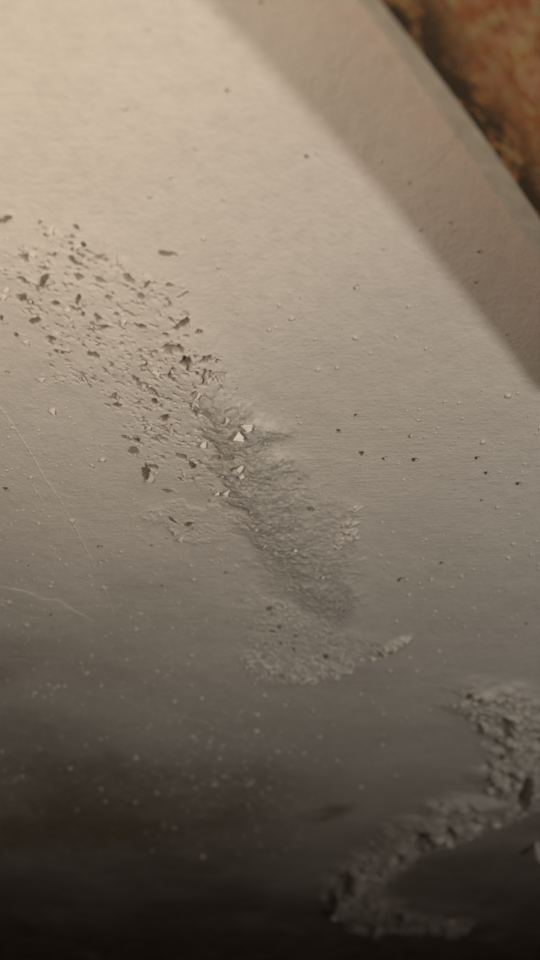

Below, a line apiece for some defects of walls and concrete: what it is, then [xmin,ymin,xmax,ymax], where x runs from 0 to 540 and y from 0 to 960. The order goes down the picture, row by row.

spalling [0,183,256,547]
spalling [216,581,415,690]
spalling [307,672,540,941]